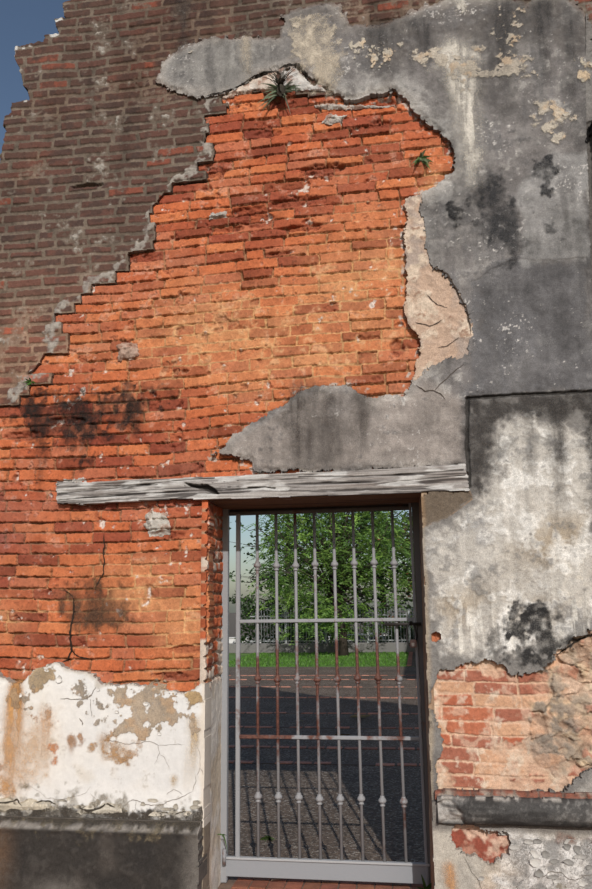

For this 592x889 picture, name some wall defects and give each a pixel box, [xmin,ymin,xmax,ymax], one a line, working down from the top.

peeling [349,37,403,68]
peeling [412,7,538,91]
leakage [437,40,480,173]
leakage [17,381,155,467]
spalling [0,66,473,741]
leakage [463,393,592,490]
crack [95,536,105,589]
crack [63,590,92,662]
leakage [503,600,578,668]
spalling [434,630,592,792]
crack [0,724,203,815]
spalling [451,824,592,889]